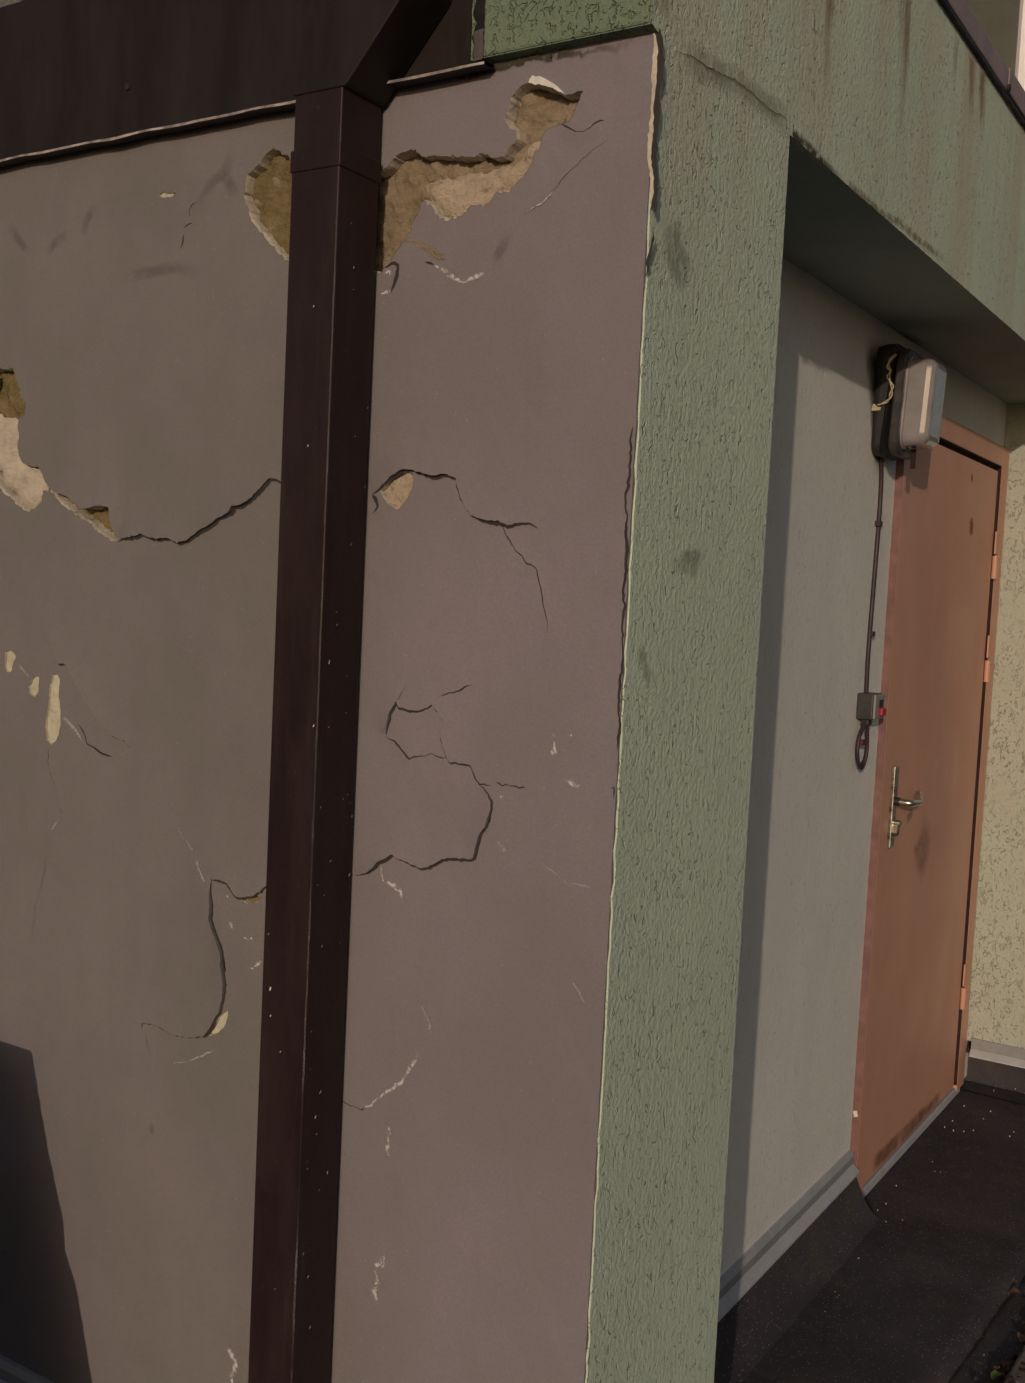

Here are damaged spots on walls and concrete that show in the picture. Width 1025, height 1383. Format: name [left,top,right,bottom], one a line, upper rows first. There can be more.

flaking render [243,148,292,261]
flaking render [375,75,583,294]
crack [646,29,664,275]
flaking render [0,367,126,542]
crack [366,416,559,634]
crack [352,674,525,876]
crack [122,858,267,1063]